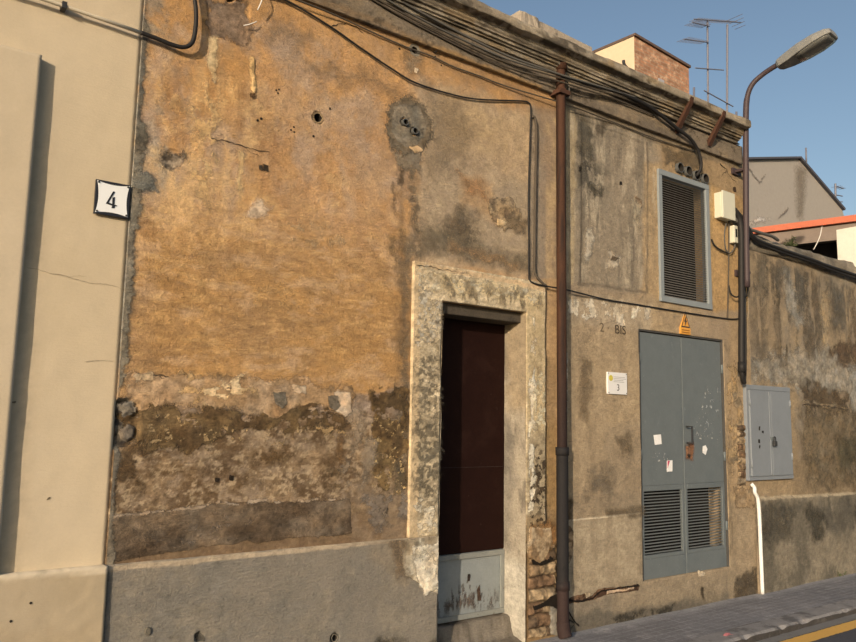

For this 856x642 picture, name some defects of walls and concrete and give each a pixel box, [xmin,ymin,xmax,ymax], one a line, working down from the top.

water stain [576,114,605,195]
water stain [585,227,595,262]
water stain [754,258,856,368]
peeling [113,370,356,491]
water stain [801,379,856,492]
spalling [368,386,441,596]
flaking render [527,366,558,638]
water stain [761,503,795,542]
water stain [806,506,827,540]
corrosion [438,574,493,611]
crack [569,584,640,628]